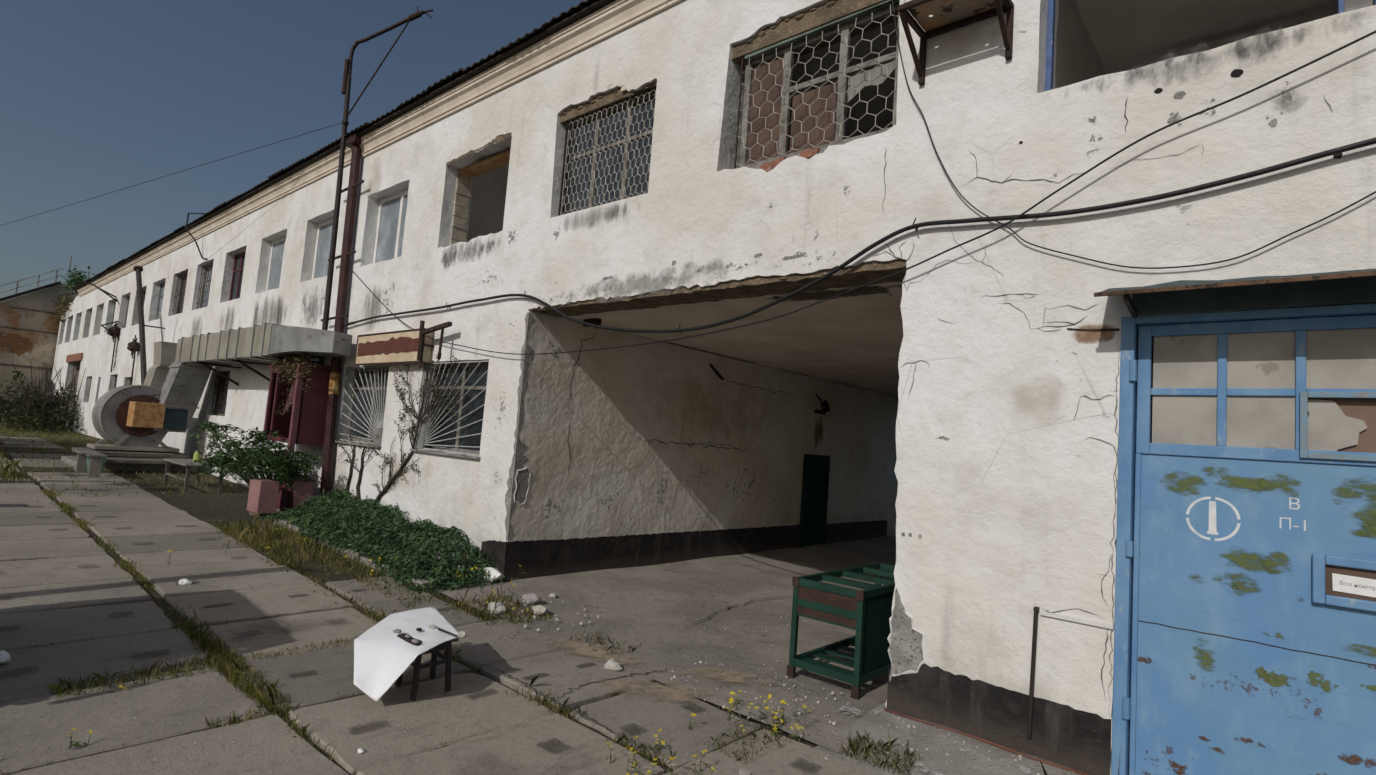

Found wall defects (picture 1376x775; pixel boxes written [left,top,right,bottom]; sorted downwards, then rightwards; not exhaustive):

leakage [570,263,721,298]
corrosion [1094,271,1376,297]
crack [566,332,599,475]
spalling [493,251,907,540]
crack [638,437,754,453]
spalling [887,587,927,681]
corrosion [1338,754,1376,768]